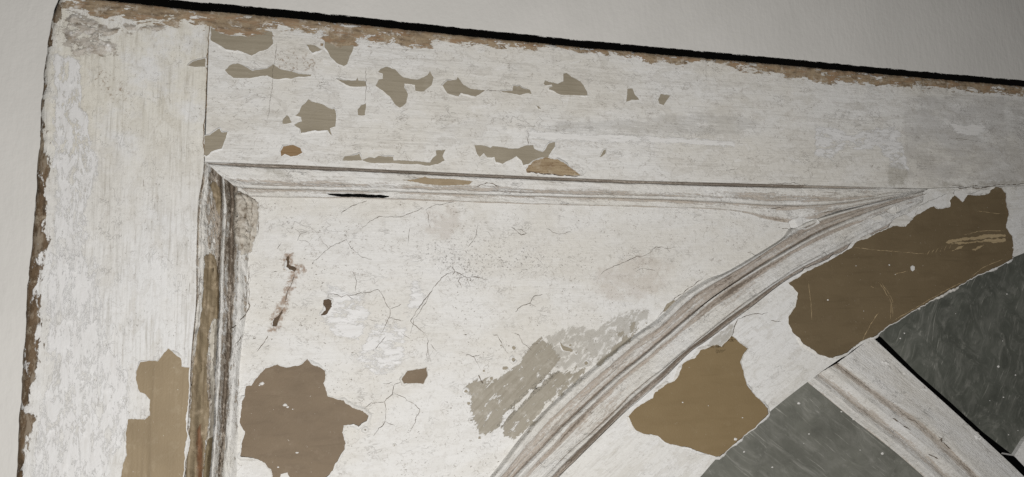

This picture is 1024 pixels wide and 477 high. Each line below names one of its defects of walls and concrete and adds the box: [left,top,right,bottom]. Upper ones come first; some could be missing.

peeling [210,27,312,80]
peeling [306,40,485,108]
peeling [543,73,588,97]
peeling [279,99,338,157]
peeling [474,141,556,167]
crack [218,275,268,351]
crack [275,201,486,358]
peeling [788,187,1014,359]
peeling [120,253,219,477]
peeling [237,358,372,477]
crack [370,382,420,429]
peeling [627,335,770,460]